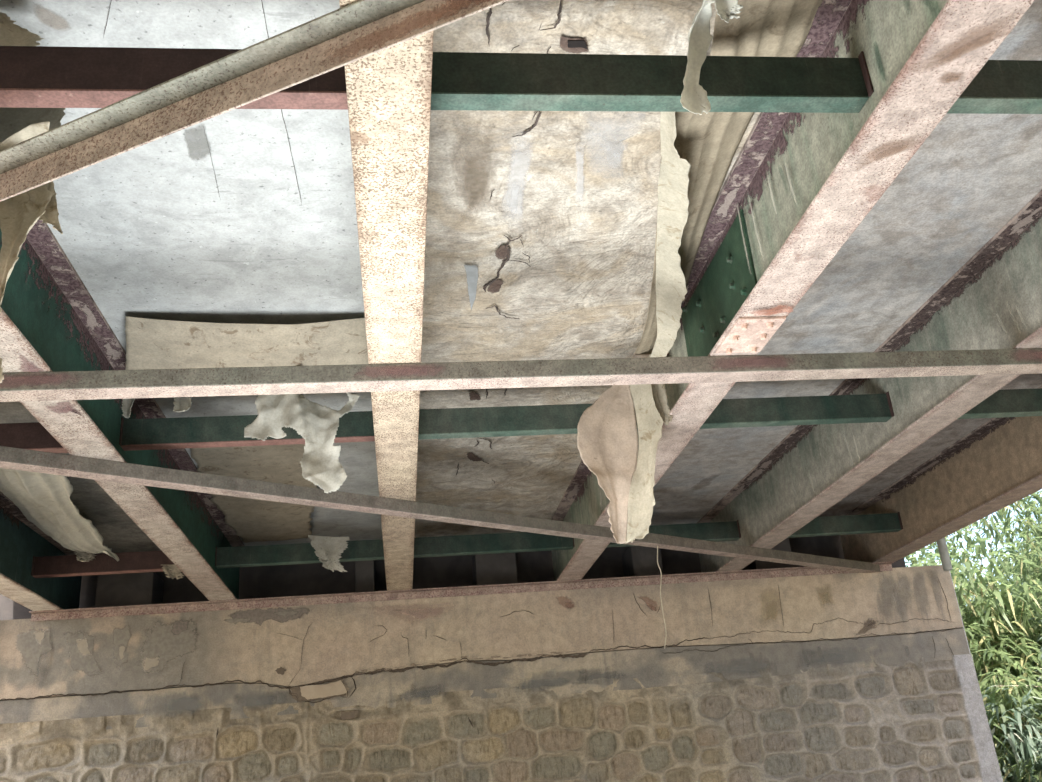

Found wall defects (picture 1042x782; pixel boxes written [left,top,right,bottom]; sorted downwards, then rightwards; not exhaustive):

crack [486,1,519,51]
crack [539,1,562,54]
corrosion [797,0,869,58]
crack [512,111,541,137]
corrosion [680,112,805,330]
crack [483,235,531,319]
corrosion [880,195,1042,352]
corrosion [833,378,869,395]
corrosion [871,417,1016,502]
peeling [17,629,52,677]
crack [0,577,955,703]
spalling [291,678,356,702]